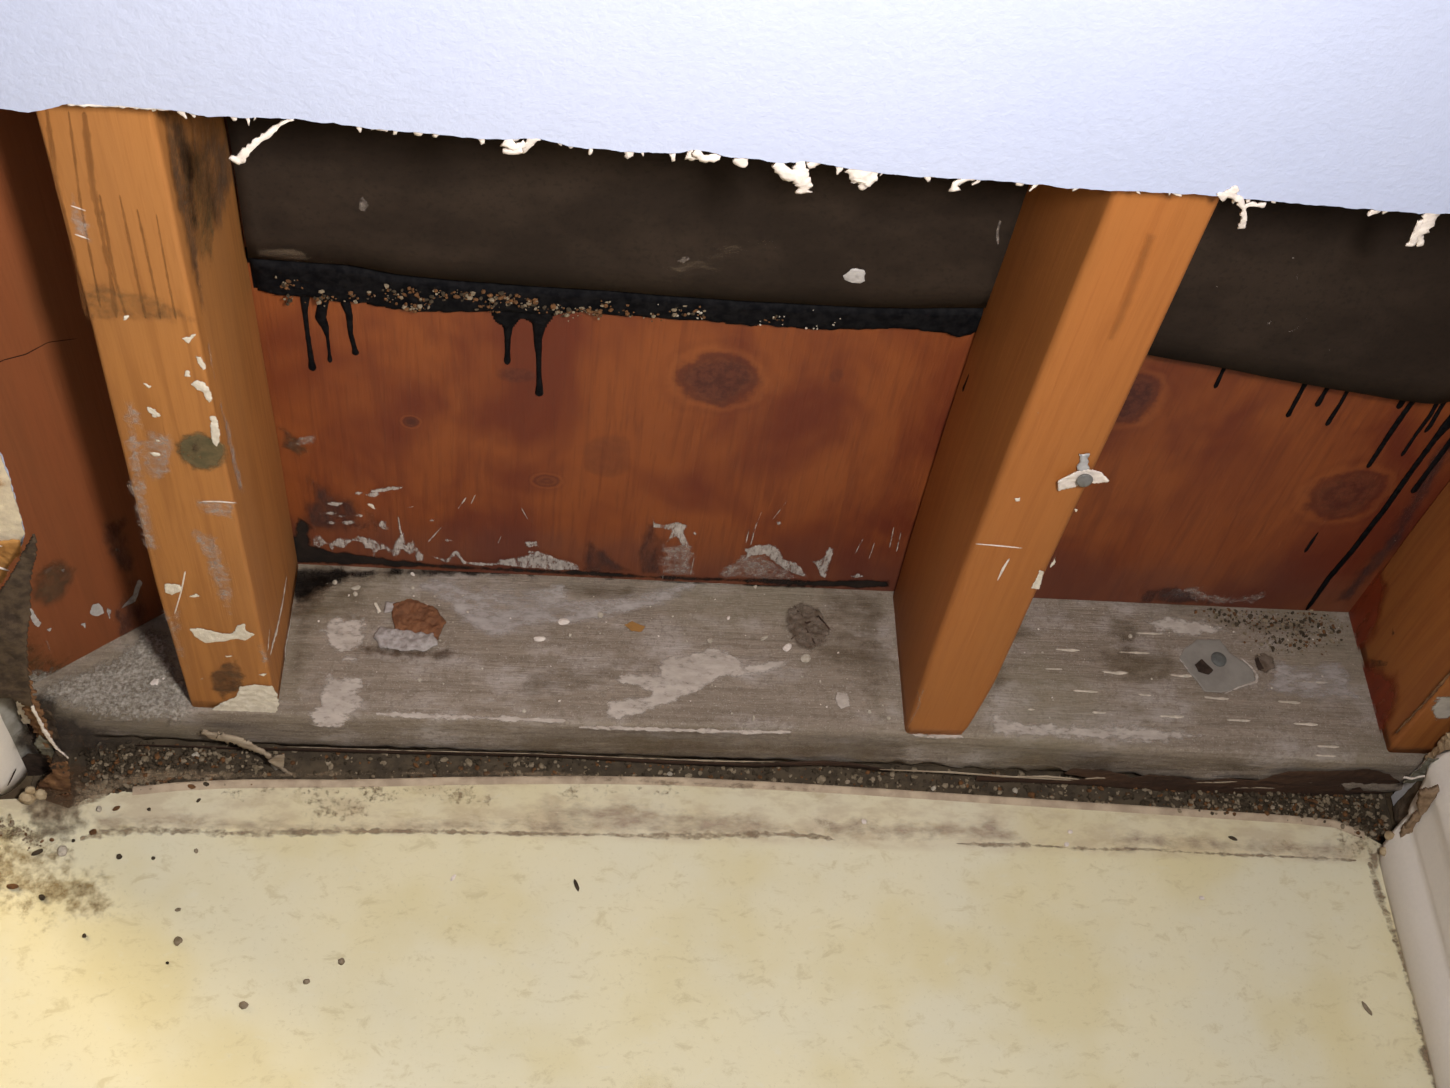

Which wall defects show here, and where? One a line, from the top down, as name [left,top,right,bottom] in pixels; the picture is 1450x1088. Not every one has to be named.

leakage [503,326,513,365]
leakage [532,322,547,397]
leakage [1270,400,1450,732]